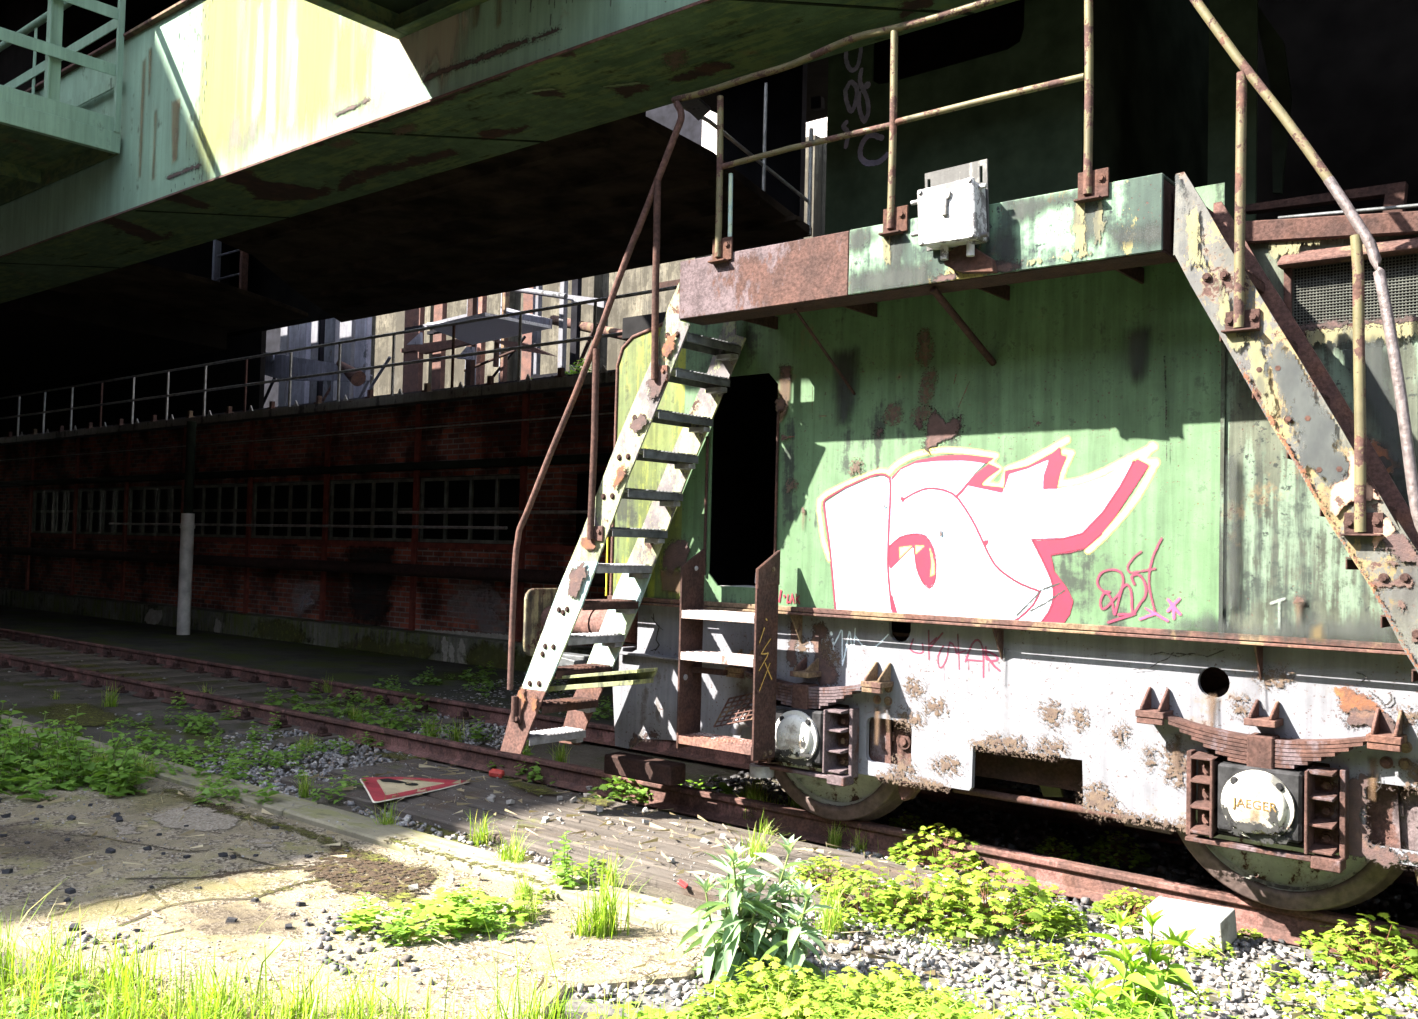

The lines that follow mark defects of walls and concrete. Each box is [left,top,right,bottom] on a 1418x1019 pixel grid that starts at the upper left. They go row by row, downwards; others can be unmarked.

corrosion [0,0,710,258]